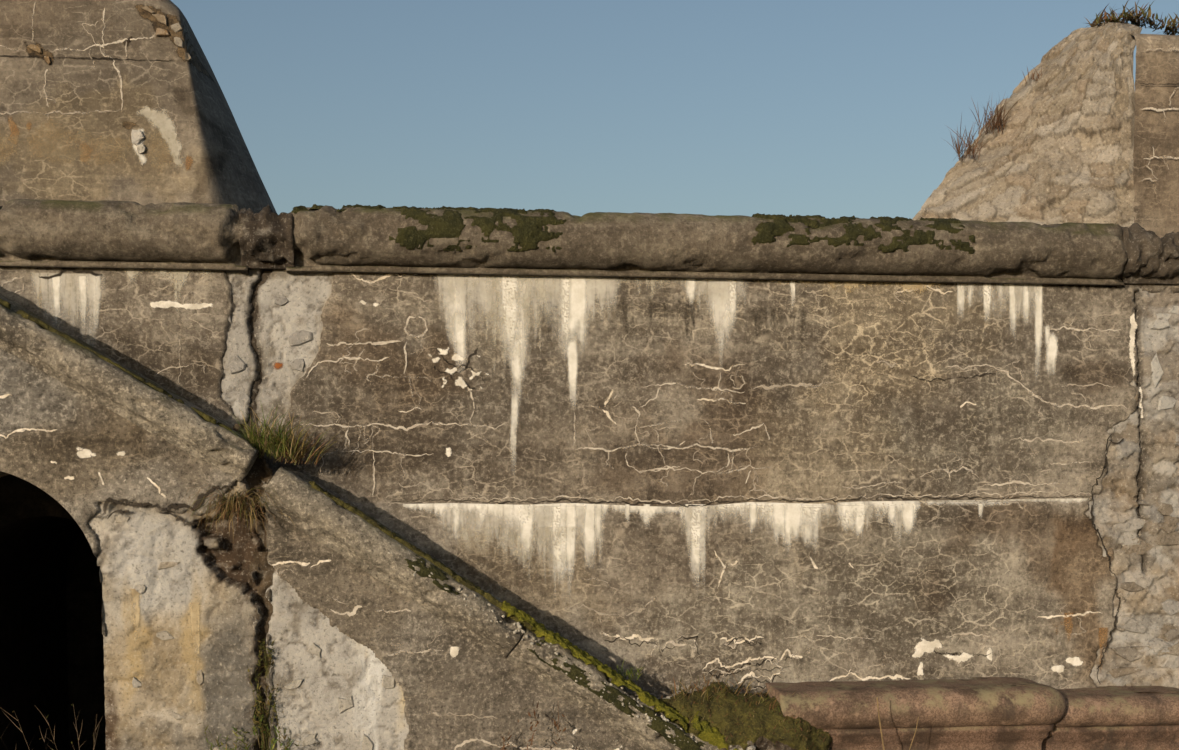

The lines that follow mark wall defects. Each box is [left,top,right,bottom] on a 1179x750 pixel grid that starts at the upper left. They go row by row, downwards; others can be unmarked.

crack [0,2,172,120]
efflorescence [34,273,101,320]
crack [51,269,331,750]
spalling [88,478,409,750]
flaking render [221,205,333,431]
crack [301,273,504,495]
water stain [428,274,759,449]
crack [573,363,834,498]
efflorescence [391,491,1091,573]
crack [842,360,1142,683]
water stain [957,283,1057,369]
spalling [1085,223,1179,689]